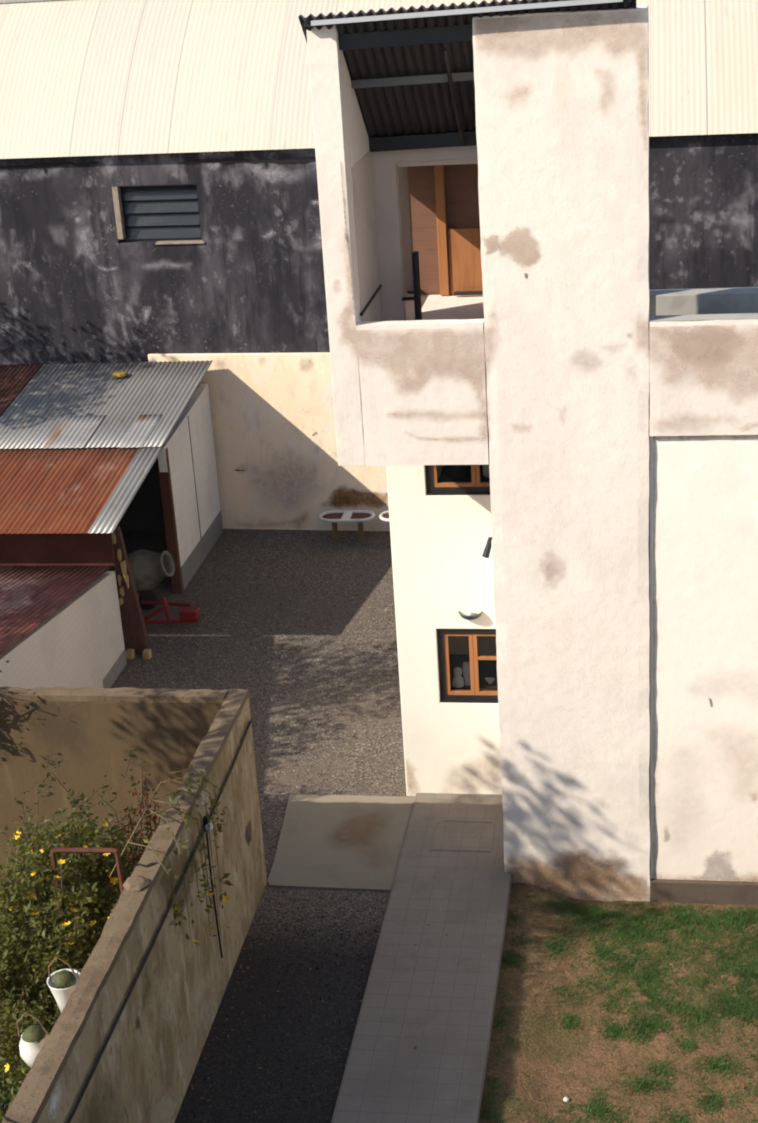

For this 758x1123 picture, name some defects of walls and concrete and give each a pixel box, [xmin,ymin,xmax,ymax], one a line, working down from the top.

leakage [253,165,292,179]
leakage [76,218,91,257]
leakage [394,332,486,392]
leakage [671,325,758,382]
leakage [509,854,645,901]